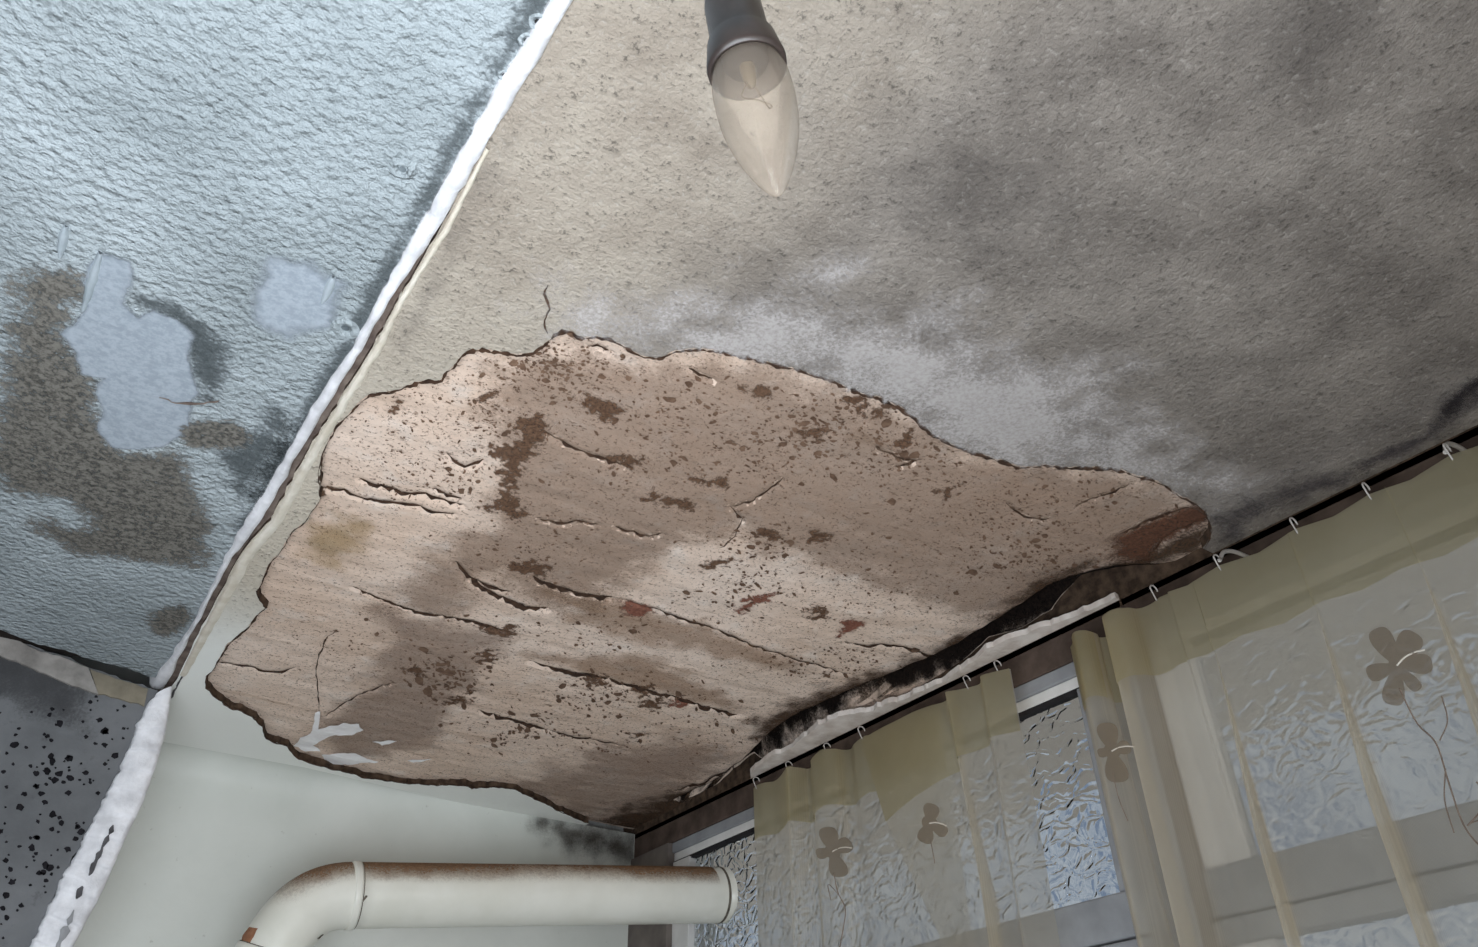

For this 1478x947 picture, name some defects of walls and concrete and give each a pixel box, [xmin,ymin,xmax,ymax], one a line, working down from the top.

peeling [61,255,198,449]
water stain [0,267,290,569]
peeling [254,258,343,337]
water stain [689,313,1163,474]
water stain [1366,379,1478,466]
water stain [145,605,193,638]
flaking render [205,329,1212,829]
water stain [0,695,129,939]